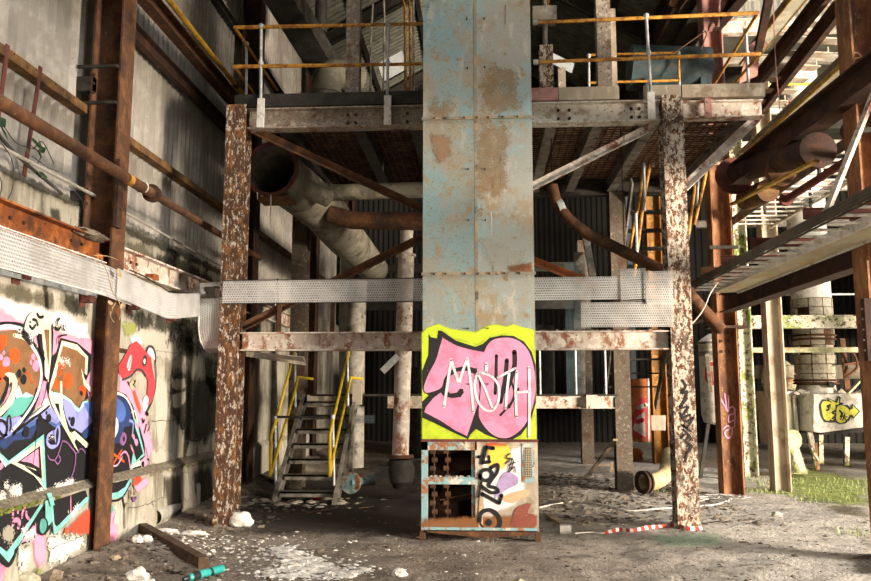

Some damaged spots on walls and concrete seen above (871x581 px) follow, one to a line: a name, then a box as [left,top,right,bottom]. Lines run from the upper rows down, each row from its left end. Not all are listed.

peeling [475,66,523,216]
leakage [128,310,218,464]
corrosion [421,516,537,528]